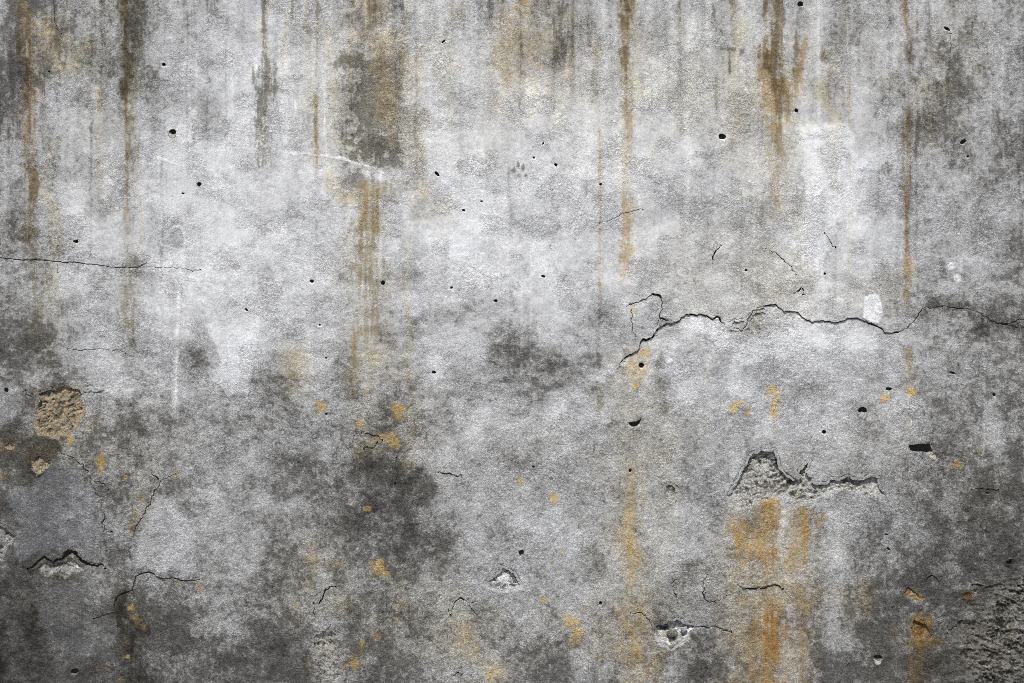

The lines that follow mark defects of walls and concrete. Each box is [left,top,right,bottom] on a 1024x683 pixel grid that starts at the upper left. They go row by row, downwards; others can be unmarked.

damp [242,0,415,364]
rust [309,76,419,480]
rust [342,0,442,210]
rust [446,0,573,119]
rust [588,0,640,322]
rust [748,0,832,233]
crack [618,243,1024,366]
peeling [0,380,117,660]
crack [28,548,107,571]
damp [334,449,428,570]
rust [702,494,851,683]
spalling [724,446,887,509]